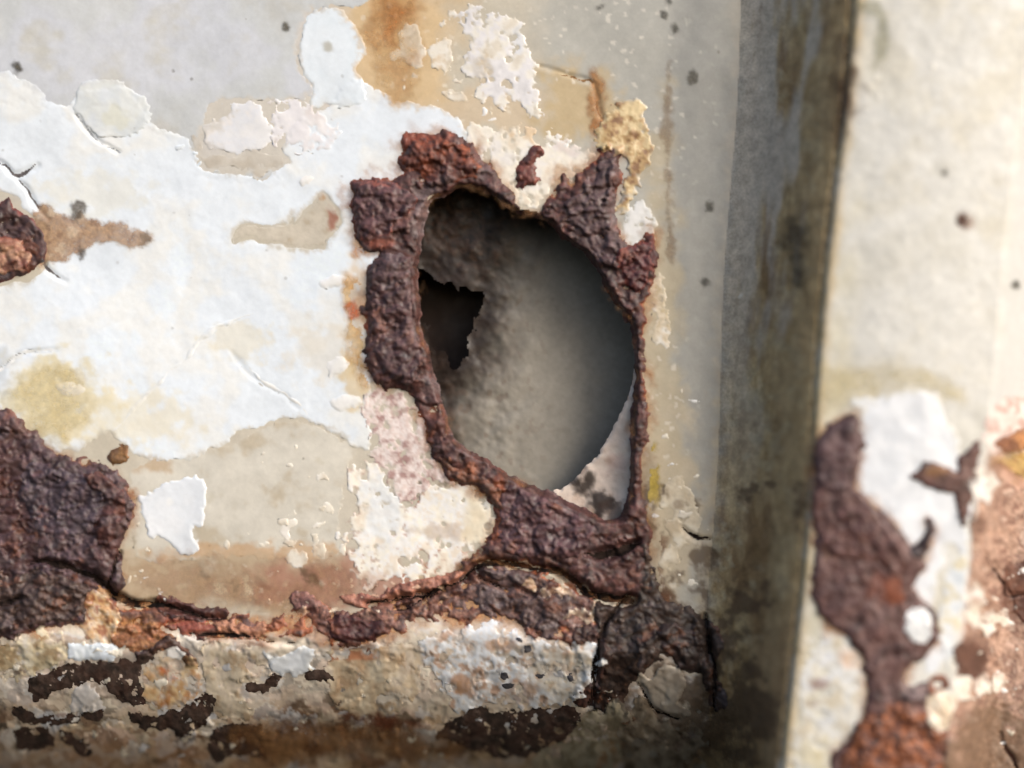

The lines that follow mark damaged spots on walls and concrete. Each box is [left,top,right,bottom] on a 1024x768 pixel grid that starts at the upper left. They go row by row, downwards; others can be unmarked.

peeling [0,0,658,612]
corrosion [229,713,462,765]
corrosion [0,129,728,712]
peeling [648,271,671,349]
corrosion [808,413,1024,768]
peeling [850,390,1017,733]
peeling [982,394,1024,456]